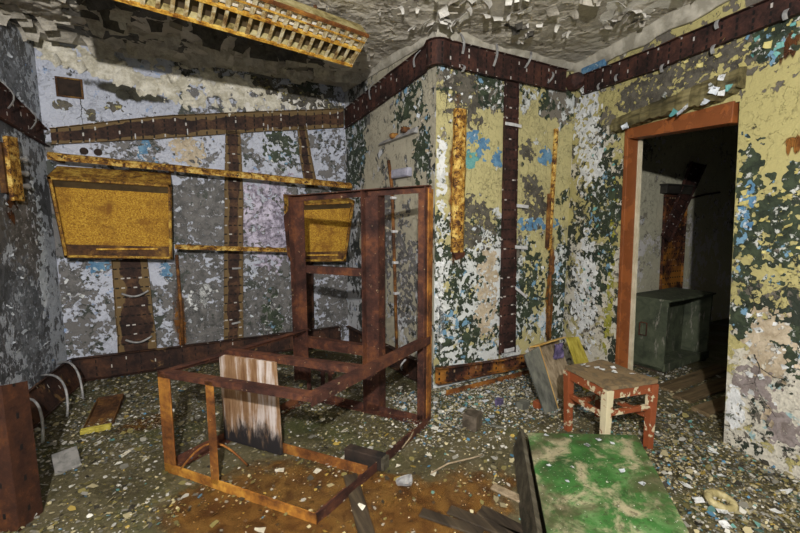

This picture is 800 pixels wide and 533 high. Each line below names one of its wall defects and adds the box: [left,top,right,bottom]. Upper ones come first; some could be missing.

peeling [2,181,51,382]
peeling [58,259,111,308]
peeling [84,101,124,121]
peeling [159,137,225,344]
peeling [243,130,299,336]
spalling [0,0,685,117]
peeling [345,116,367,204]
peeling [383,166,418,335]
peeling [391,66,504,366]
rust [545,238,555,340]
peeling [516,86,629,355]
peeling [725,131,800,450]